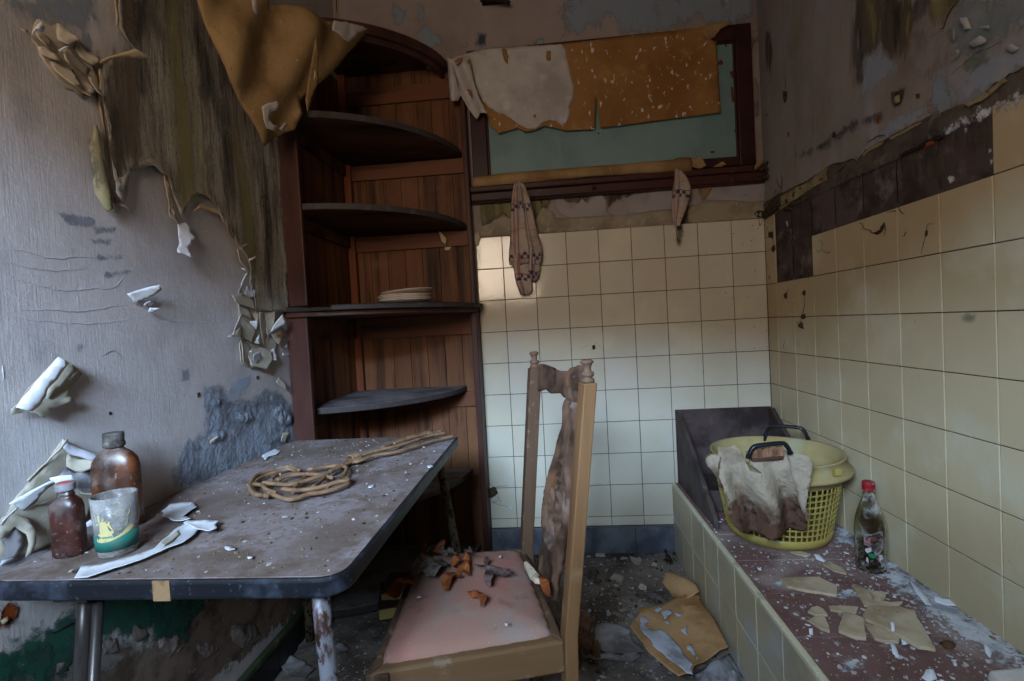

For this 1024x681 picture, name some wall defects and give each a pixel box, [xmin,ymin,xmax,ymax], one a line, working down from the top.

peeling [19,19,104,99]
peeling [332,21,368,42]
peeling [262,101,288,132]
peeling [89,125,113,212]
peeling [535,66,1024,283]
peeling [62,214,115,260]
peeling [177,222,196,258]
peeling [474,214,511,246]
peeling [127,284,162,313]
peeling [228,243,290,380]
peeling [0,603,76,681]
spalling [100,598,303,681]